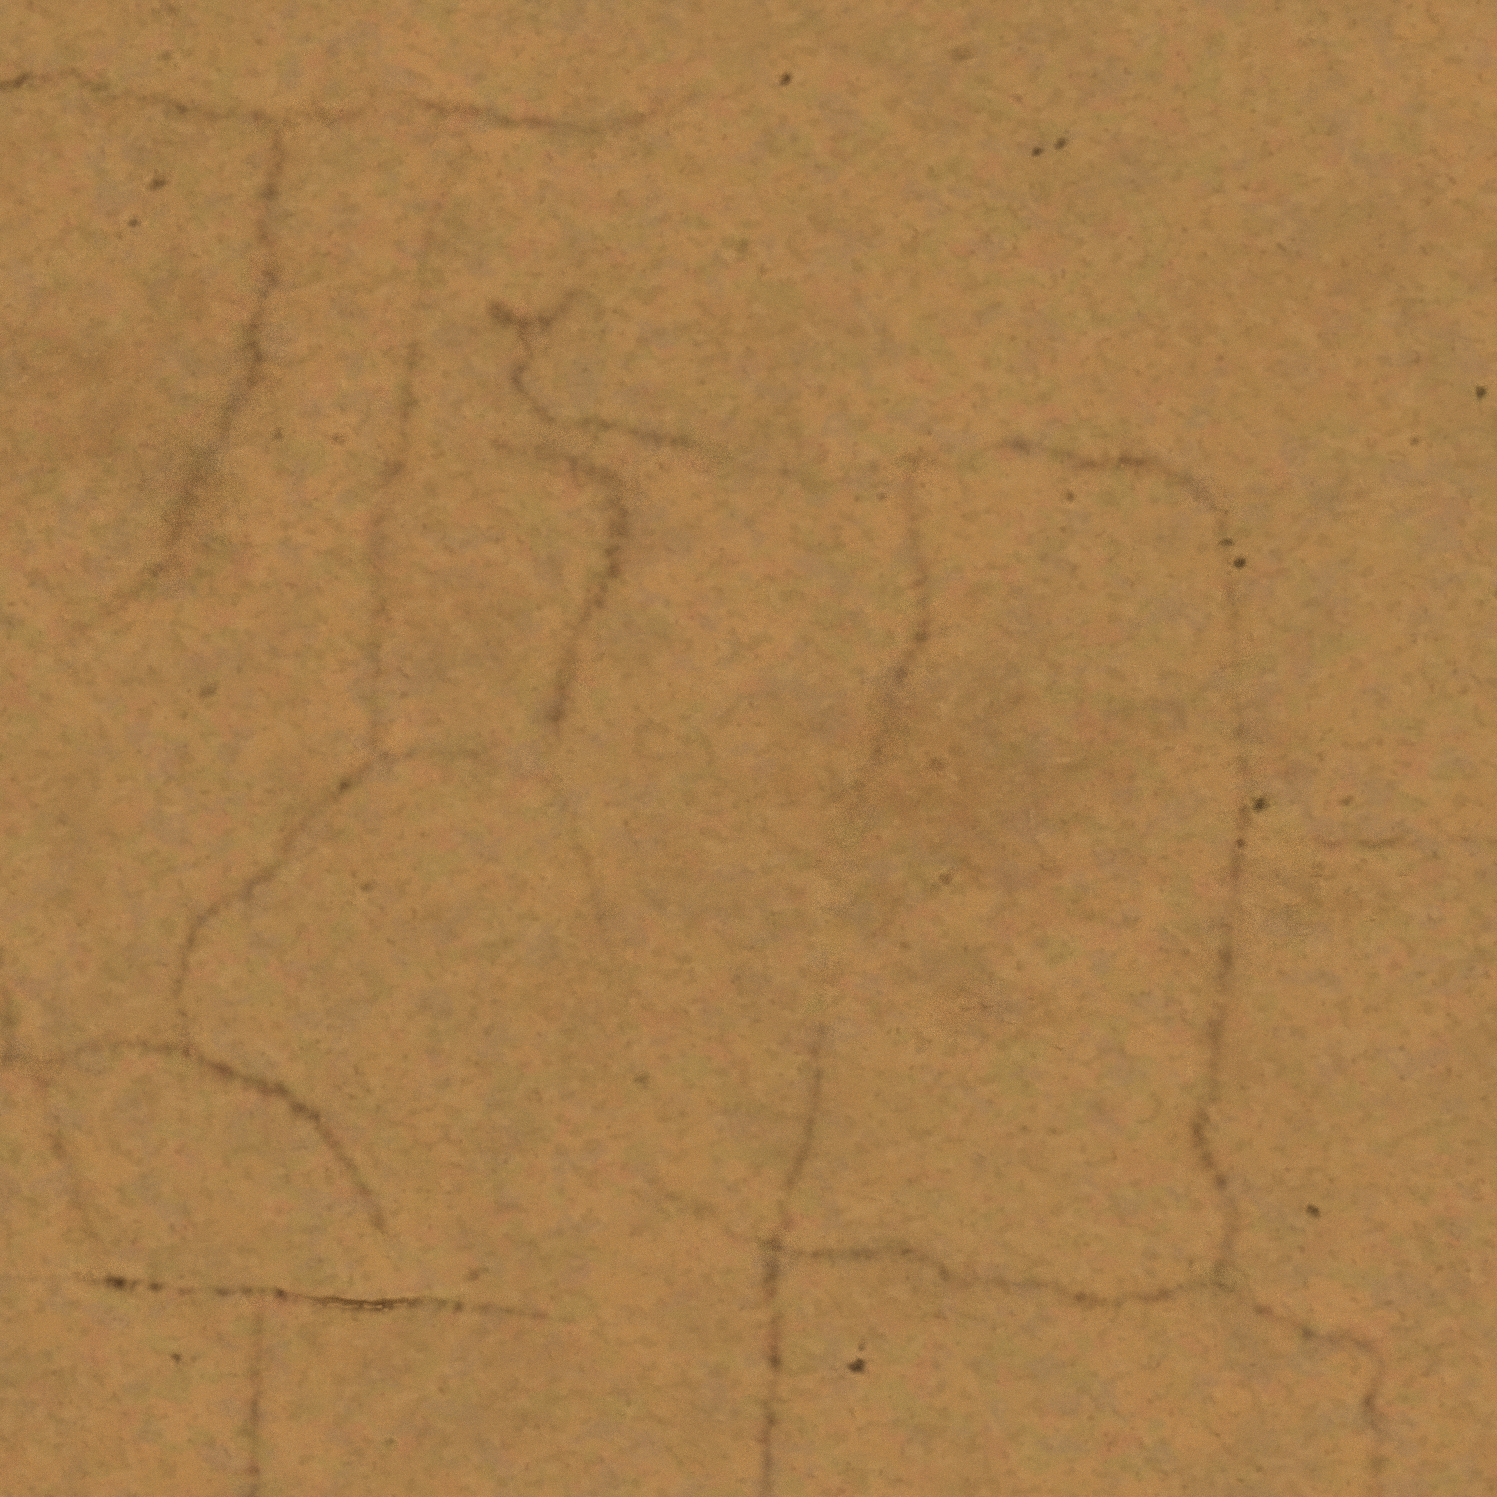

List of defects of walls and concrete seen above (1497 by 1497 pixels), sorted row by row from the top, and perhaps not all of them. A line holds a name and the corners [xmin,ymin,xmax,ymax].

crack [108,1279,156,1288]
crack [350,1302,393,1310]